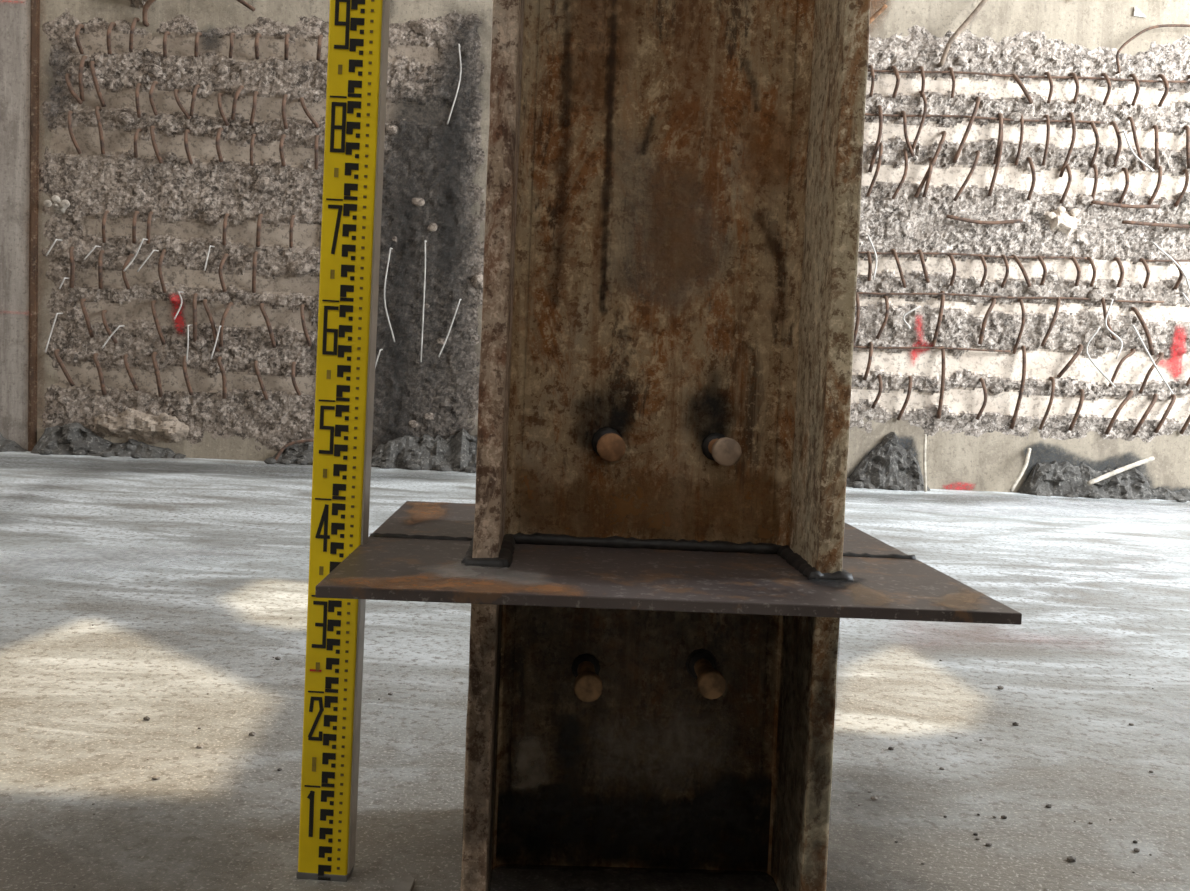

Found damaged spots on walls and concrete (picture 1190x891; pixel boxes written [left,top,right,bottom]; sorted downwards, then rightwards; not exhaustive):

spalling [39,0,329,462]
spalling [372,10,486,452]
corrosion [556,28,571,262]
corrosion [600,0,617,312]
spalling [849,0,1190,443]